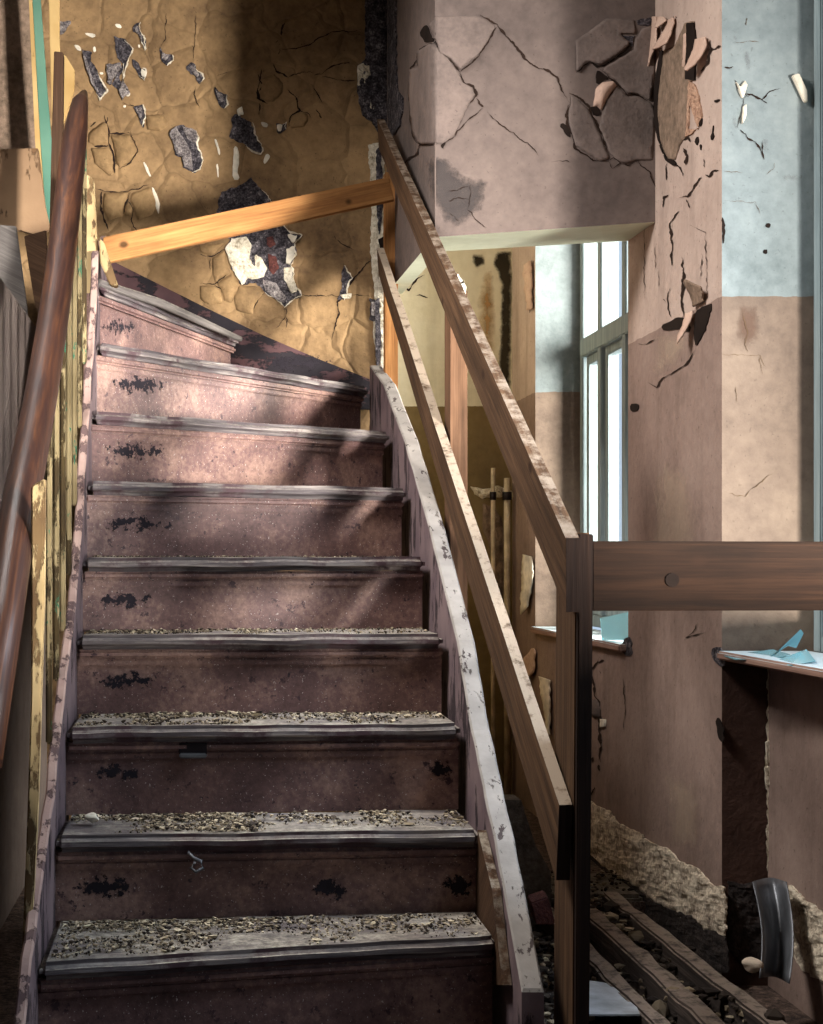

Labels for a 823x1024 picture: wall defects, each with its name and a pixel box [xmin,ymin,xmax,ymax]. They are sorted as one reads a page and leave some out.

flaking render [82,22,147,100]
crack [256,23,357,122]
peeling [560,16,715,166]
crack [90,103,146,231]
flaking render [216,178,272,213]
crack [405,16,741,316]
crack [201,249,228,301]
flaking render [225,226,302,308]
crack [278,236,373,337]
crack [649,353,693,388]
peeling [591,801,761,975]
peeling [788,885,823,983]